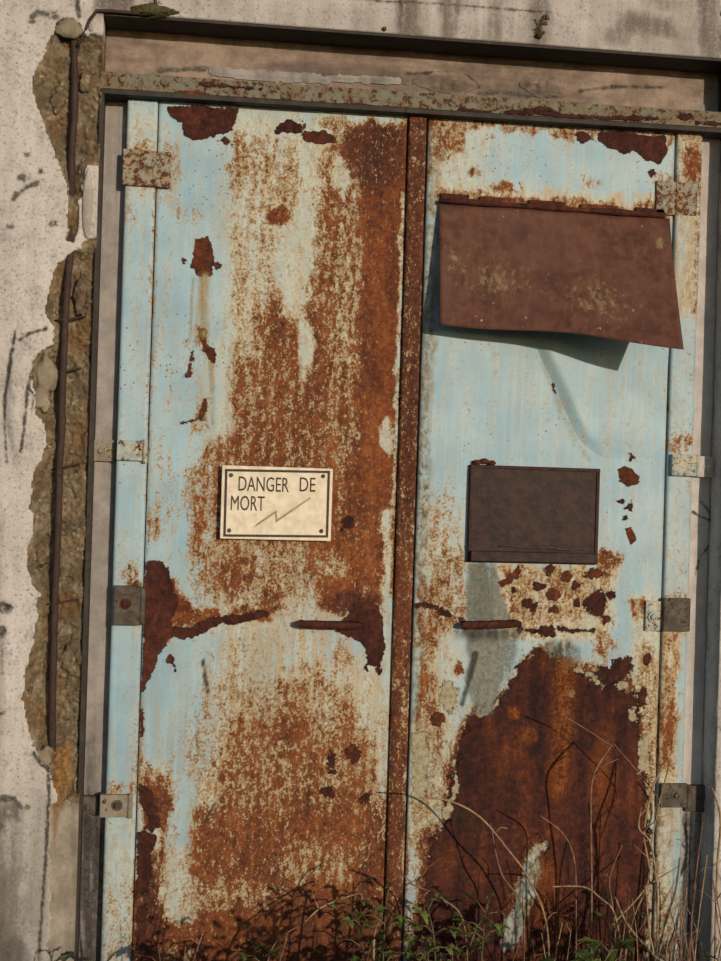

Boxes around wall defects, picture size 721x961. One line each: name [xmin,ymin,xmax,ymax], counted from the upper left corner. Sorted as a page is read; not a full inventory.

damp [619,14,671,38]
rust [177,81,263,101]
peeling [158,66,567,98]
rust [504,106,659,121]
rust [675,113,721,127]
spalling [11,169,43,201]
rust [180,236,222,424]
spalling [21,9,105,961]
rust [340,515,354,532]
rust [319,743,362,799]
rust [413,564,653,961]
rust [135,784,161,954]